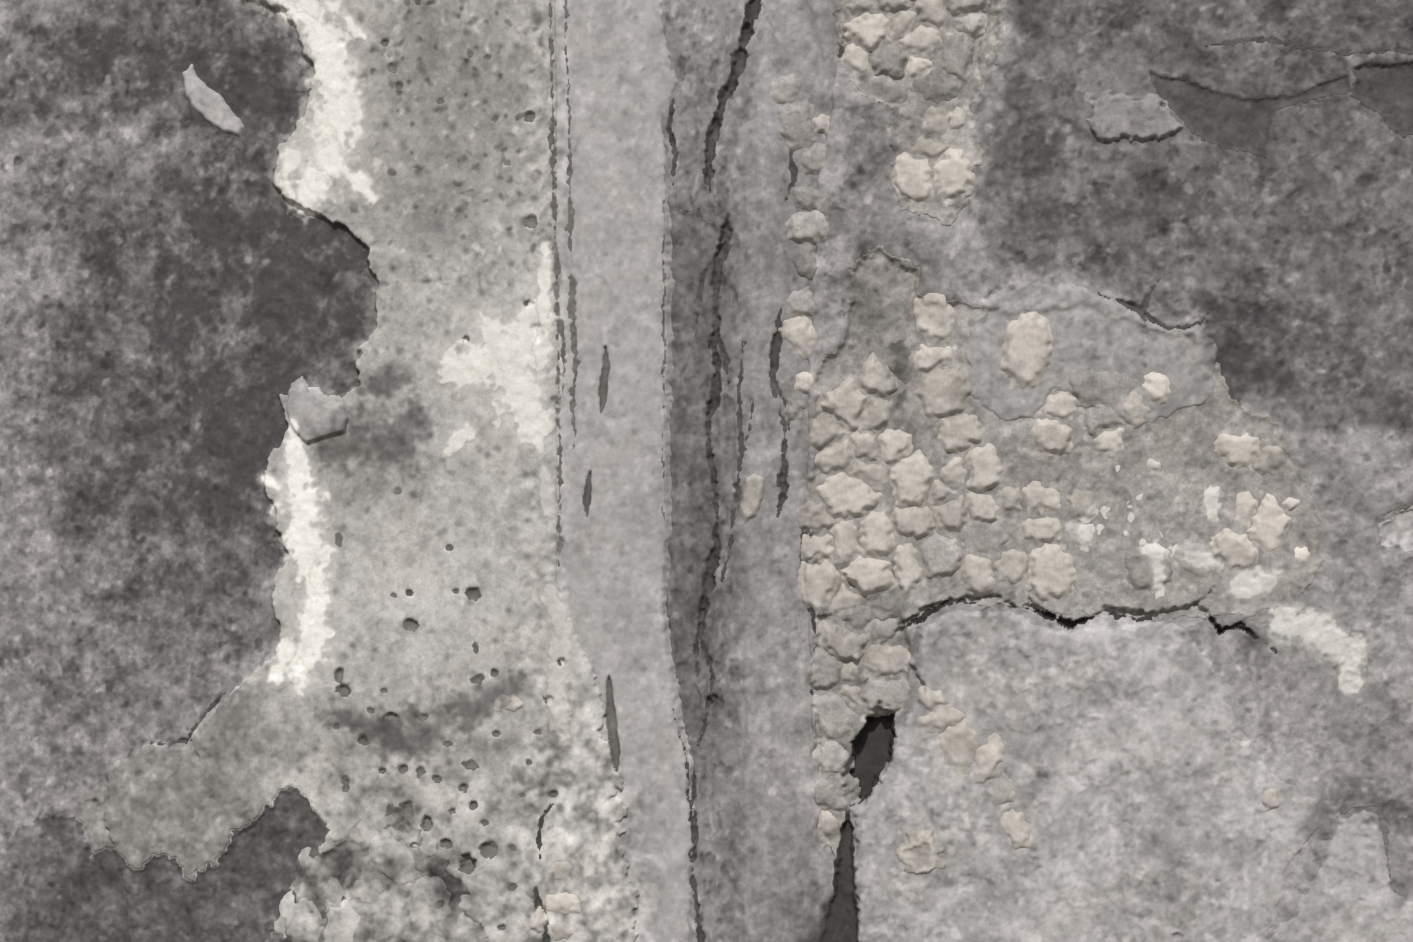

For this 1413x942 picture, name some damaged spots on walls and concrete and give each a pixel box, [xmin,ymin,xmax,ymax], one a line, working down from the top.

spalling [0,0,516,942]
crack [547,0,581,567]
crack [666,0,808,942]
crack [807,606,816,695]
spalling [832,0,1008,226]
crack [904,590,1277,654]
spalling [797,245,1413,942]
flaking render [1086,57,1413,158]